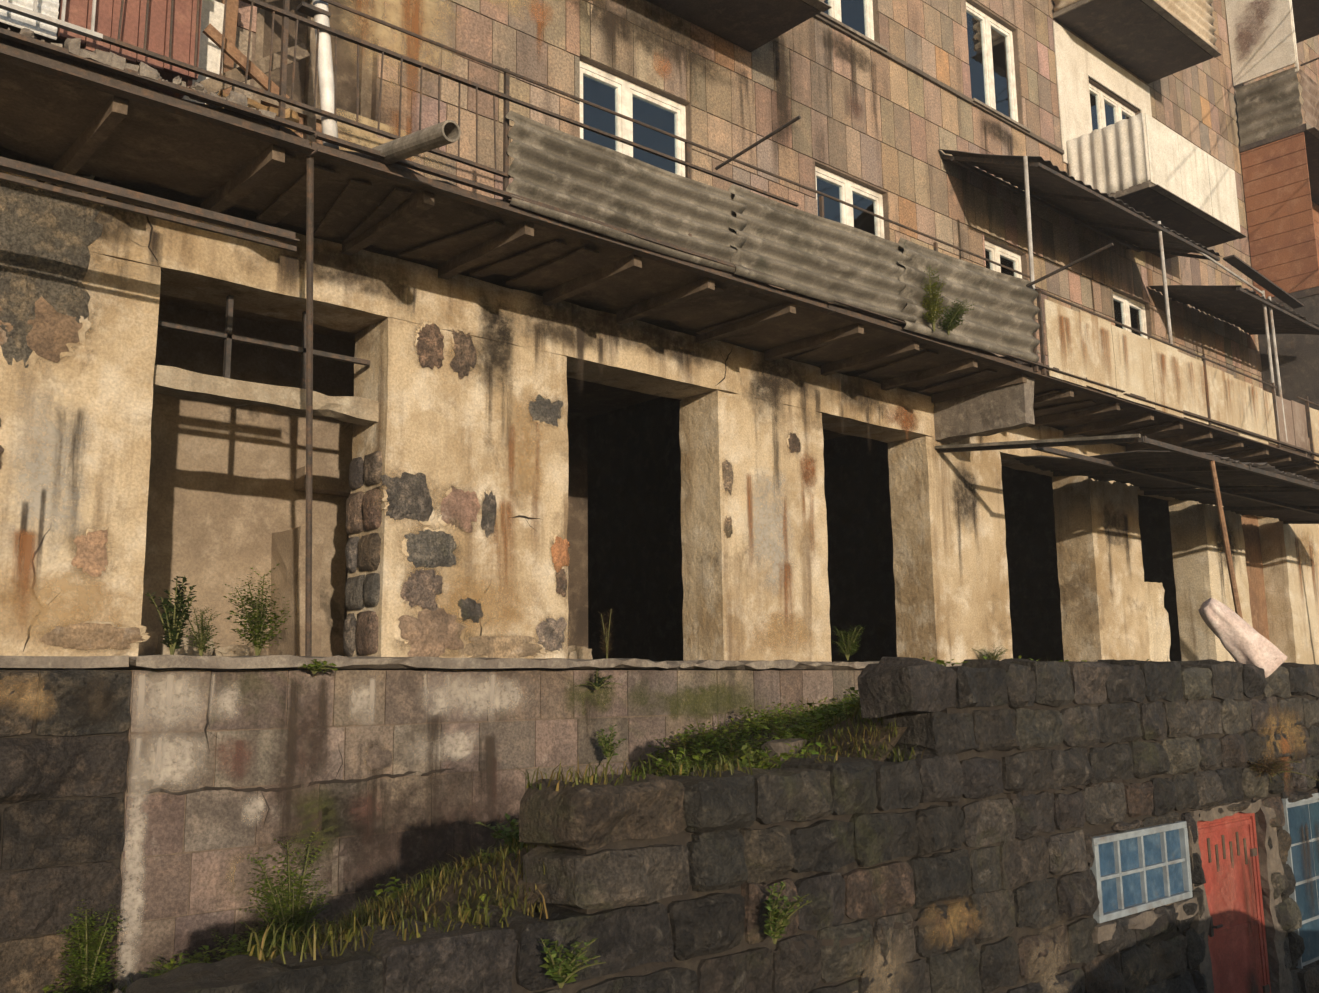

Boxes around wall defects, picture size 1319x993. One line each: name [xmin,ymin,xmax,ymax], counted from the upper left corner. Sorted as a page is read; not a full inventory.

damp [775,34,790,126]
flaking render [0,170,111,381]
flaking render [414,321,477,380]
corrosion [1061,316,1070,343]
corrosion [801,458,815,508]
damp [954,471,978,533]
flaking render [71,526,108,577]
flaking render [343,451,570,658]
crack [204,674,220,752]
crack [135,743,451,828]
damp [329,674,520,893]